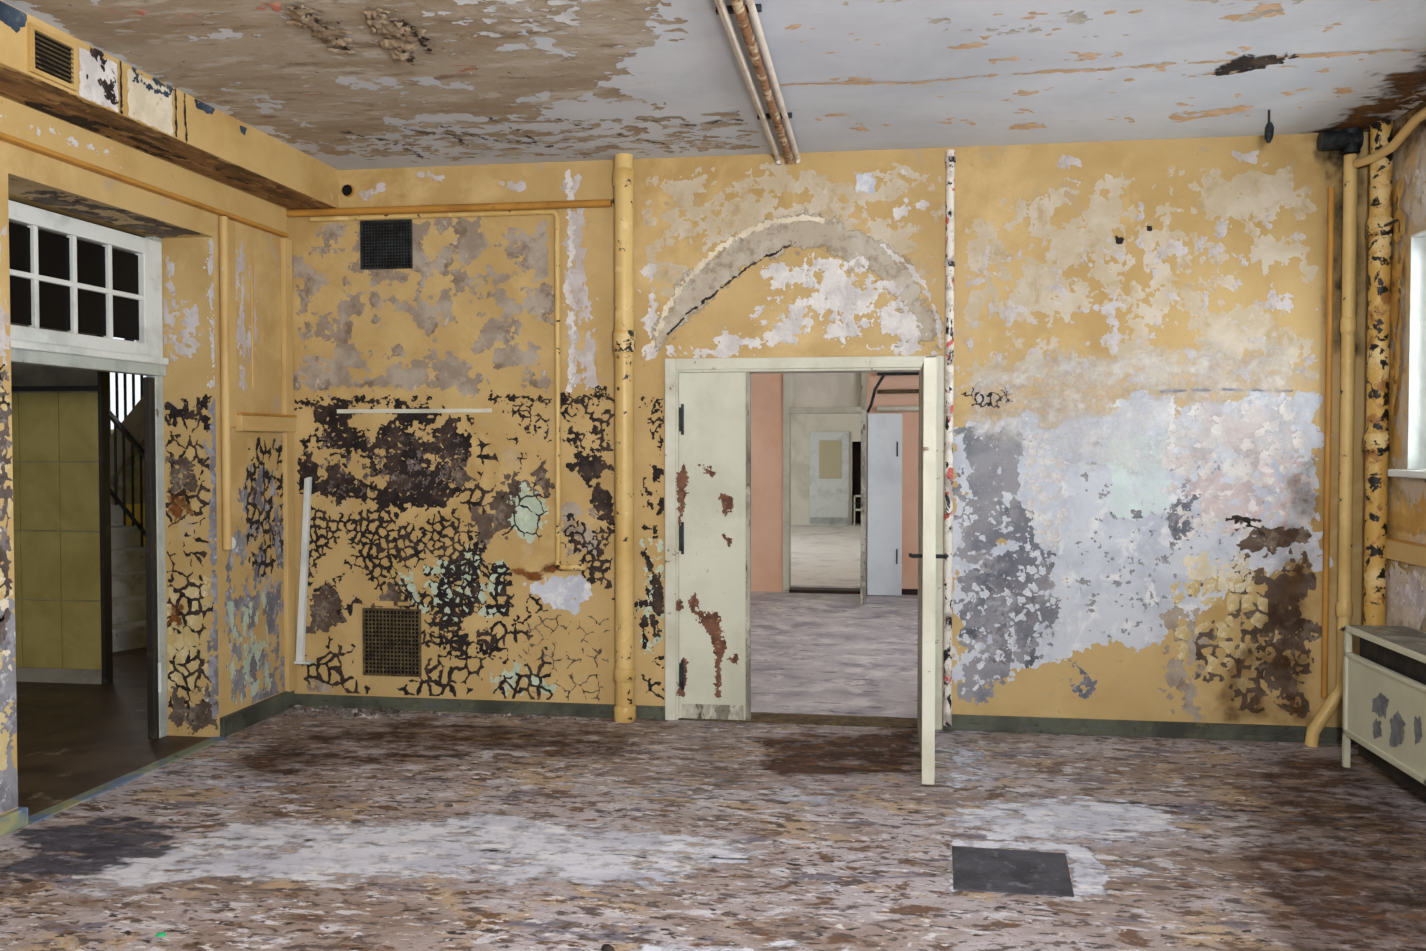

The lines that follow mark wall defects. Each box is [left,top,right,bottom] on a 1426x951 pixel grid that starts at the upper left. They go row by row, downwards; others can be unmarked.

peeling [0,0,946,418]
peeling [926,9,1143,93]
water stain [1322,150,1362,231]
water stain [1307,55,1426,149]
peeling [0,498,18,814]
peeling [306,582,347,634]
crack [165,117,743,725]
peeling [302,432,615,621]
peeling [490,660,557,696]
peeling [634,462,739,700]
peeling [952,150,1333,722]
peeling [1386,561,1426,630]